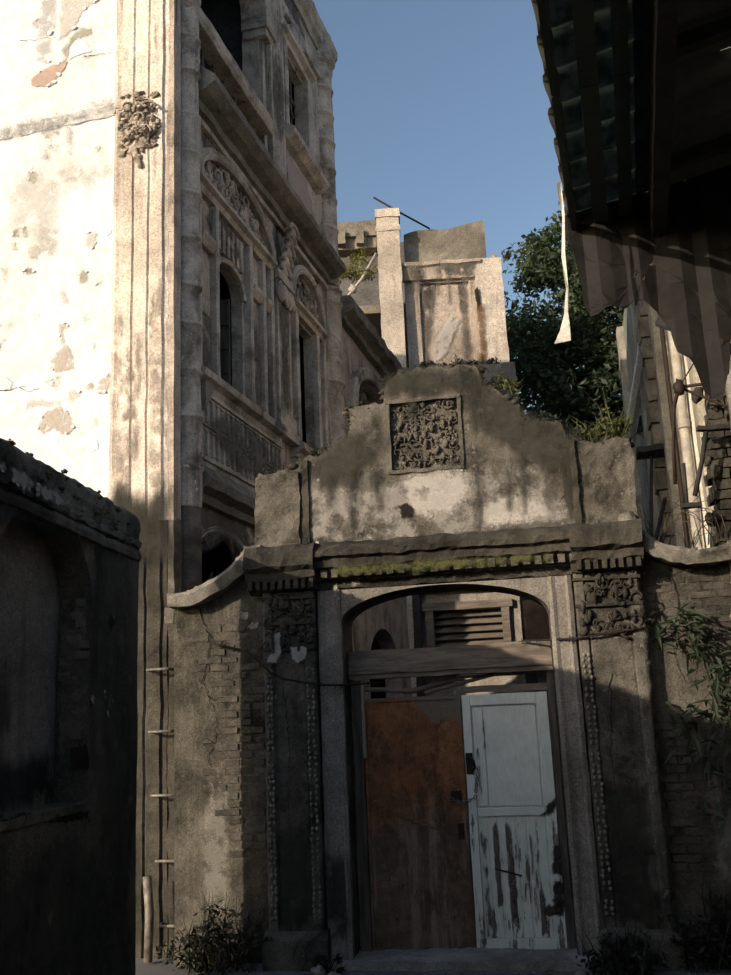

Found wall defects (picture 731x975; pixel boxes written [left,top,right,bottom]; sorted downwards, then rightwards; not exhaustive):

peeling [31,0,97,87]
leakage [385,262,578,517]
leakage [315,417,382,502]
peeling [540,798,556,816]
peeling [480,823,520,937]
peeling [529,835,565,937]